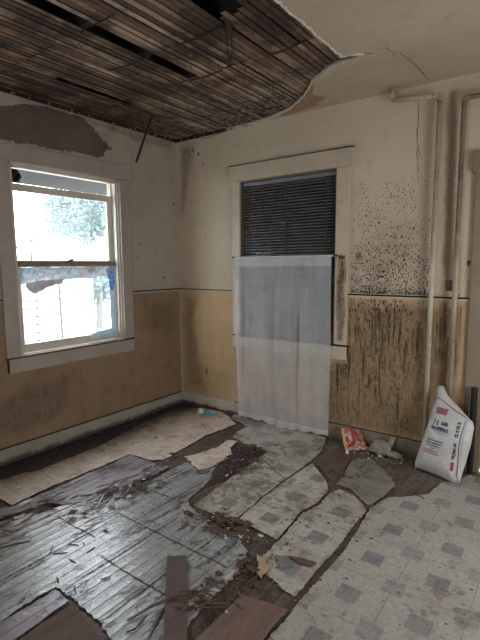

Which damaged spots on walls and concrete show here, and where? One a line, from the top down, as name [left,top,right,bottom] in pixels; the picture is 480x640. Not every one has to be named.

flaking render [0,0,364,158]
crack [414,100,422,181]
leakage [326,177,432,433]
peeling [97,466,152,506]
peeling [200,570,226,587]